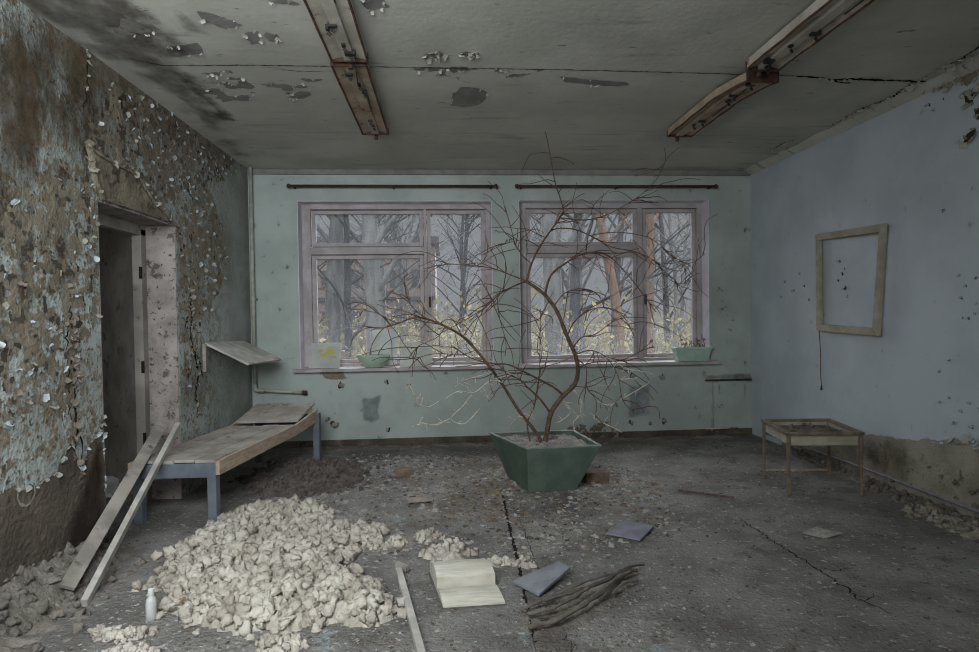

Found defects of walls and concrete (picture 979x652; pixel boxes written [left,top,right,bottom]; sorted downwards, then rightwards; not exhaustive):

leakage [24,0,189,93]
crack [130,58,327,72]
peeling [197,11,282,45]
peeling [413,50,488,107]
crack [398,67,739,75]
crack [779,47,979,129]
leakage [0,30,105,318]
peeling [0,82,238,427]
peeling [0,415,108,587]
leakage [70,454,101,546]
peeling [782,402,979,518]
crack [502,495,574,652]